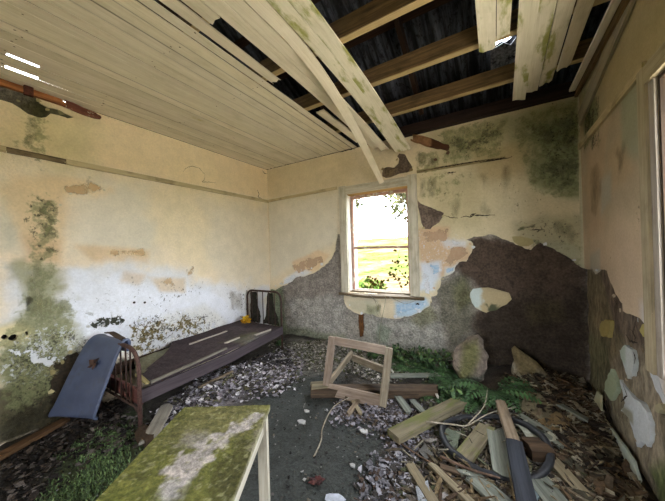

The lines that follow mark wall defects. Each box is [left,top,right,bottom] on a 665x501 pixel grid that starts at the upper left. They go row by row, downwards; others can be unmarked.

spalling [381,154,413,178]
flaking render [411,134,450,155]
crack [419,156,512,173]
damp [23,197,57,251]
spalling [271,201,665,501]
damp [6,396,64,442]